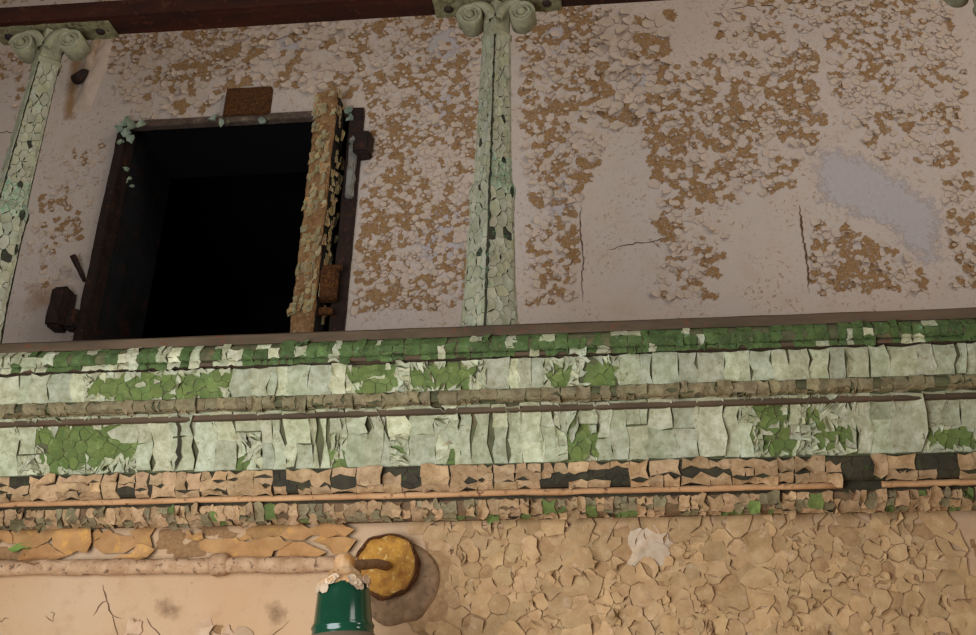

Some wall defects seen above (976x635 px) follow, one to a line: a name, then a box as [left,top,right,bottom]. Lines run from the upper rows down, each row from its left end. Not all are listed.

peeling [0,48,31,116]
peeling [26,15,484,325]
crack [609,236,672,250]
peeling [515,0,976,307]
crack [95,589,122,635]
peeling [0,319,976,635]